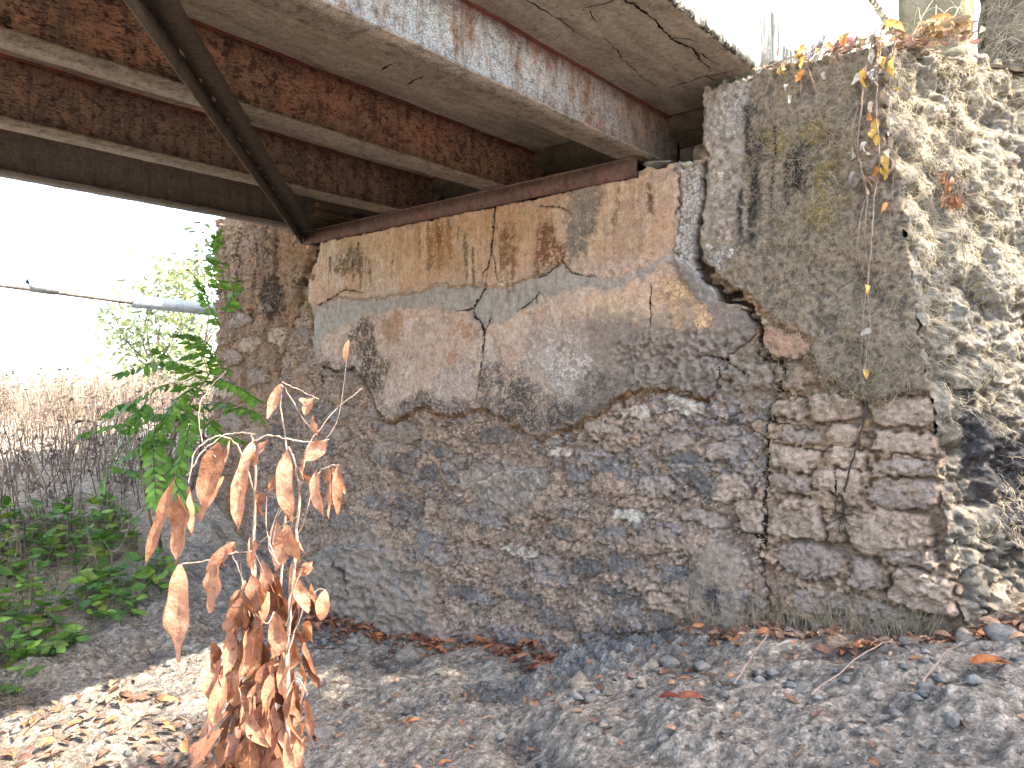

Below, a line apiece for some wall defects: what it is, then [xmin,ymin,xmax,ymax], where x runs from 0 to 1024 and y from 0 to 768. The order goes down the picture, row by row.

crack [527,0,734,88]
peeling [704,85,748,139]
crack [271,241,362,375]
damp [329,243,371,282]
damp [457,227,475,284]
crack [460,206,498,399]
crack [517,251,591,312]
spalling [672,161,932,406]
flaking render [320,361,711,444]
crack [699,254,802,559]